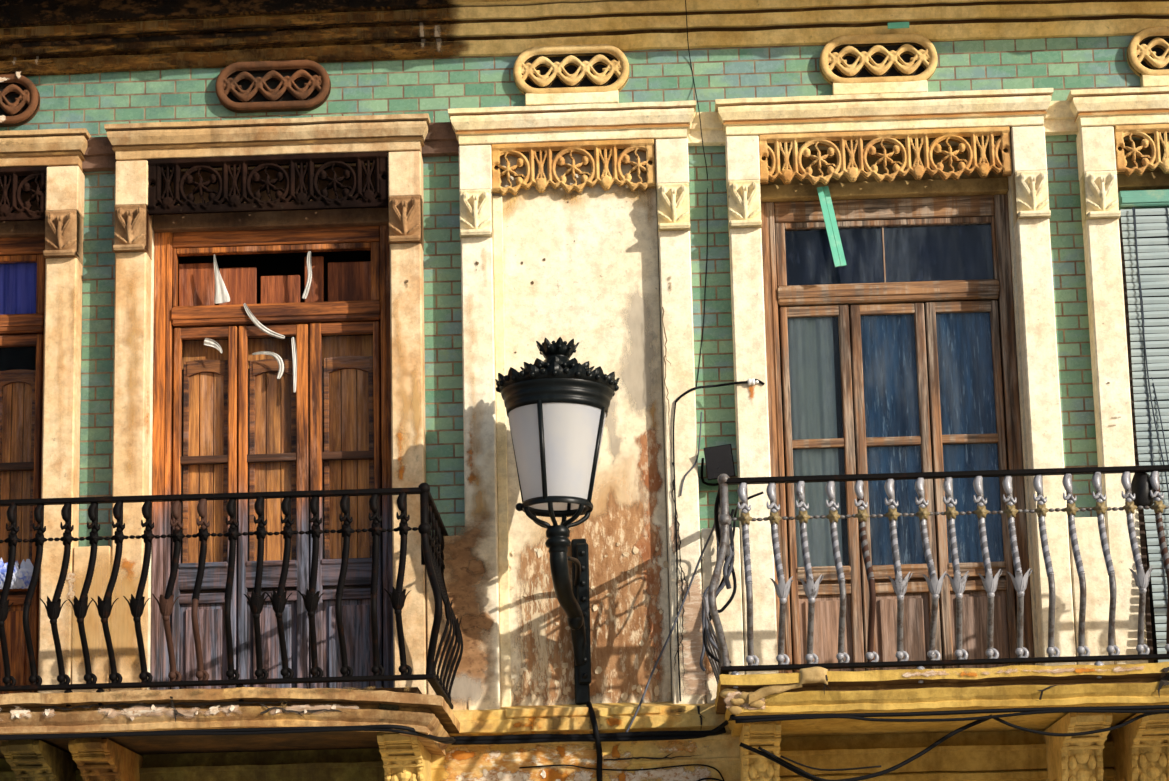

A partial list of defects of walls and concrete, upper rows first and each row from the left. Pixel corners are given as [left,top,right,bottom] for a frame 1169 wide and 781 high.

leakage [0,0,467,76]
leakage [622,293,656,428]
leakage [606,399,620,456]
peeling [0,706,55,719]
peeling [99,705,241,721]
peeling [270,704,358,714]
peeling [443,741,711,781]